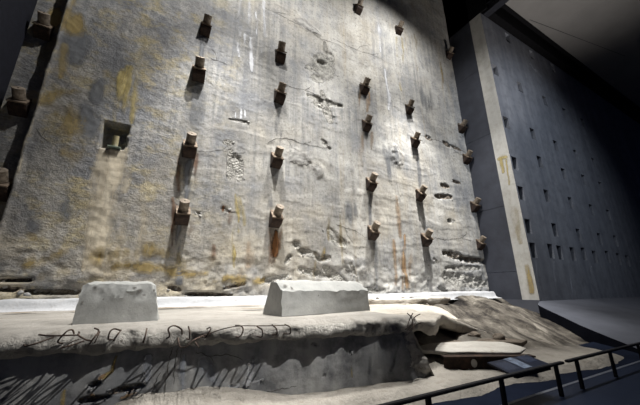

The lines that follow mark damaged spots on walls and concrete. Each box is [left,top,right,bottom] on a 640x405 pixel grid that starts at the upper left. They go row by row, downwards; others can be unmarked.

spalling [305,40,343,124]
spalling [223,139,245,182]
spalling [434,178,461,201]
rust [271,230,281,257]
spalling [260,274,293,289]
spalling [292,241,345,281]
spalling [322,228,350,254]
rust [393,224,409,288]
spalling [433,249,486,292]